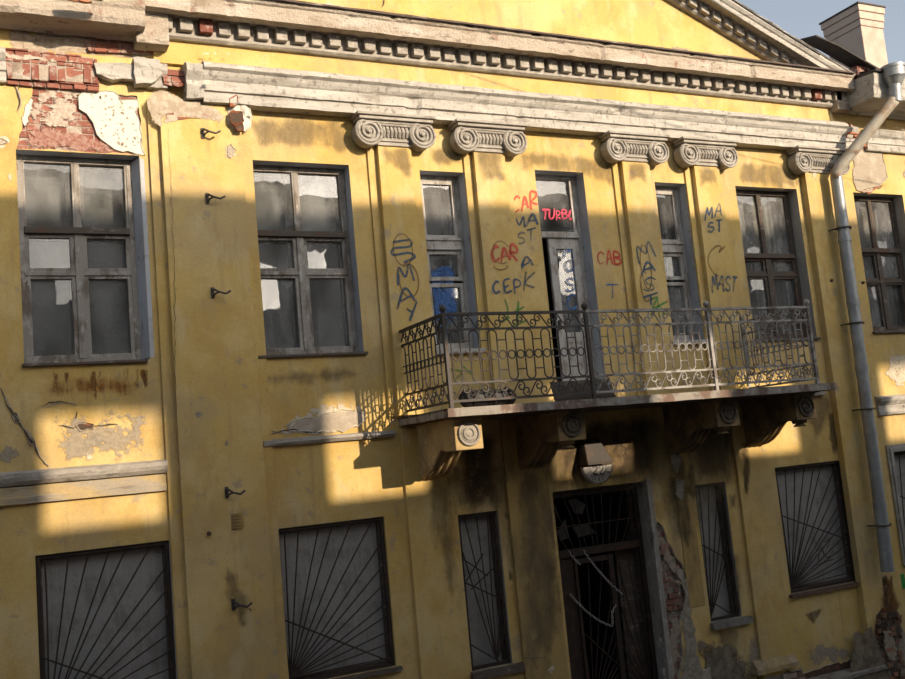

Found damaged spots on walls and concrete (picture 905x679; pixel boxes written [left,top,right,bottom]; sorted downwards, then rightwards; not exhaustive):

flaking render [198,18,213,36]
flaking render [0,29,224,155]
spalling [852,143,888,195]
rust [77,372,126,398]
peeling [885,355,905,386]
crack [1,389,49,467]
crack [40,401,114,429]
peeling [55,412,146,461]
damp [465,440,493,503]
damp [561,420,652,476]
flaking render [656,523,685,679]
flaking render [874,607,905,679]